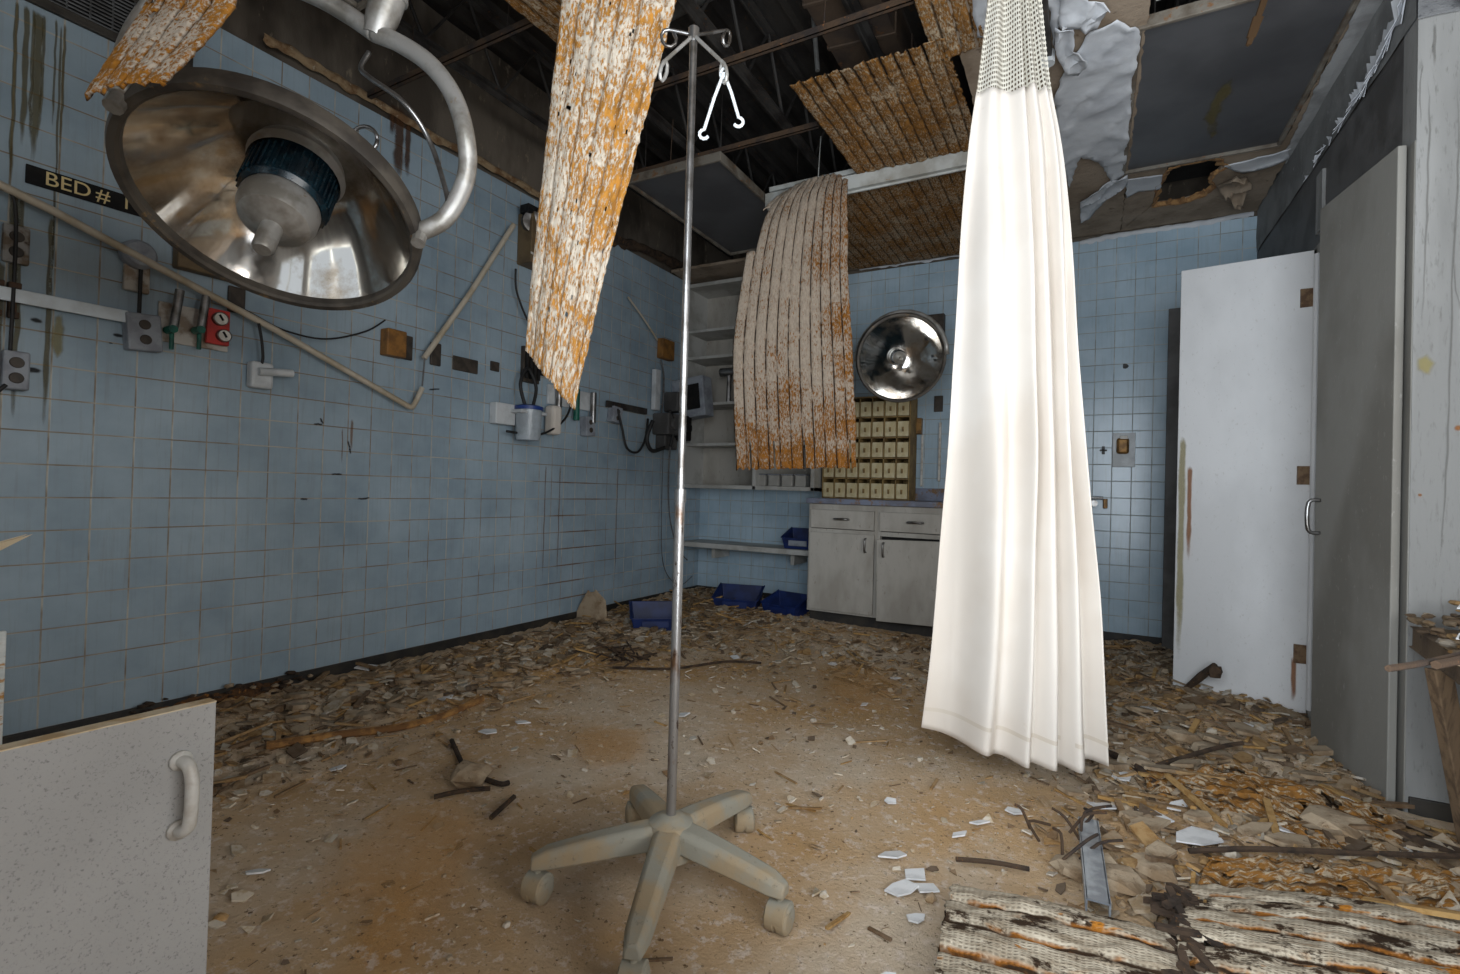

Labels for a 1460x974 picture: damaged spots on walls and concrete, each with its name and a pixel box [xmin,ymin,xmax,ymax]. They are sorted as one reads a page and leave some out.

water stain [9,4,66,175]
peeling [972,0,987,38]
peeling [1048,0,1290,245]
water stain [43,191,63,399]
flaking render [612,234,683,269]
flaking render [859,255,959,270]